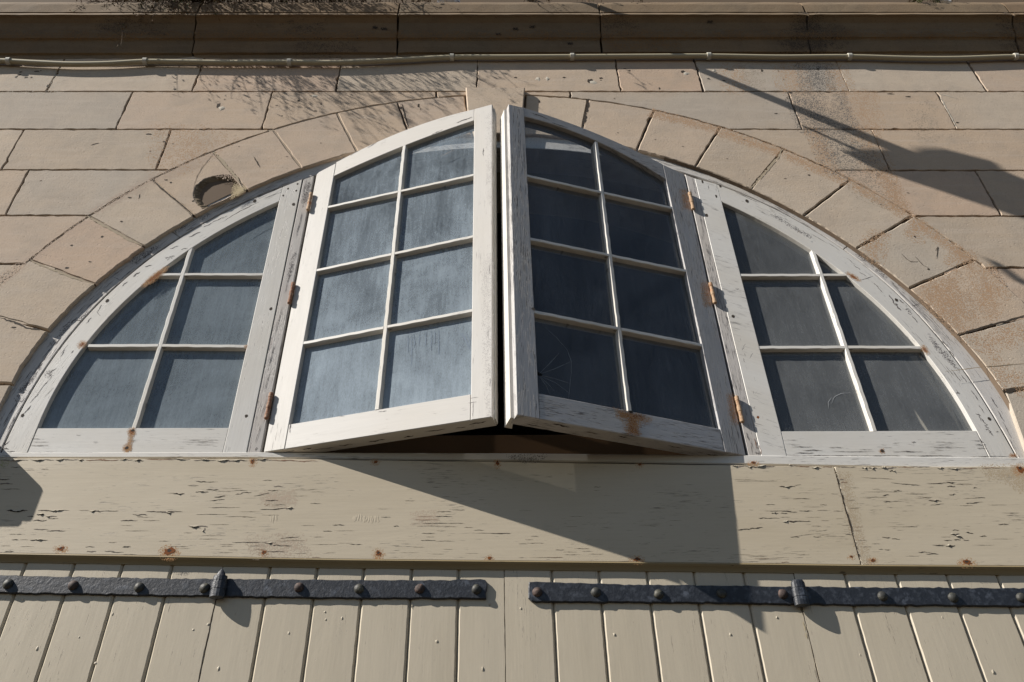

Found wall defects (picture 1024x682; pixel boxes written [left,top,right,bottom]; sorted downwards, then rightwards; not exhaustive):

rust [124,428,136,452]
peeling [788,441,961,495]
peeling [196,481,294,510]
peeling [7,509,69,541]
crack [737,484,870,559]
rust [158,544,181,561]